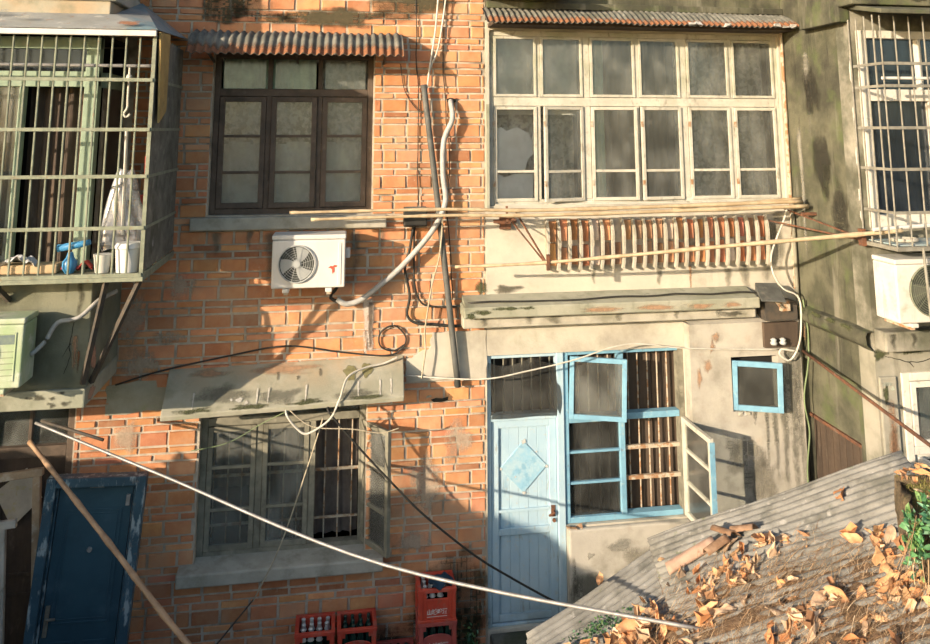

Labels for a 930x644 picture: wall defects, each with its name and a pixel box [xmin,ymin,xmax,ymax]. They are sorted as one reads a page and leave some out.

leakage [202,0,452,28]
leakage [803,55,819,113]
leakage [798,131,806,236]
leakage [813,139,849,234]
leakage [191,376,308,409]